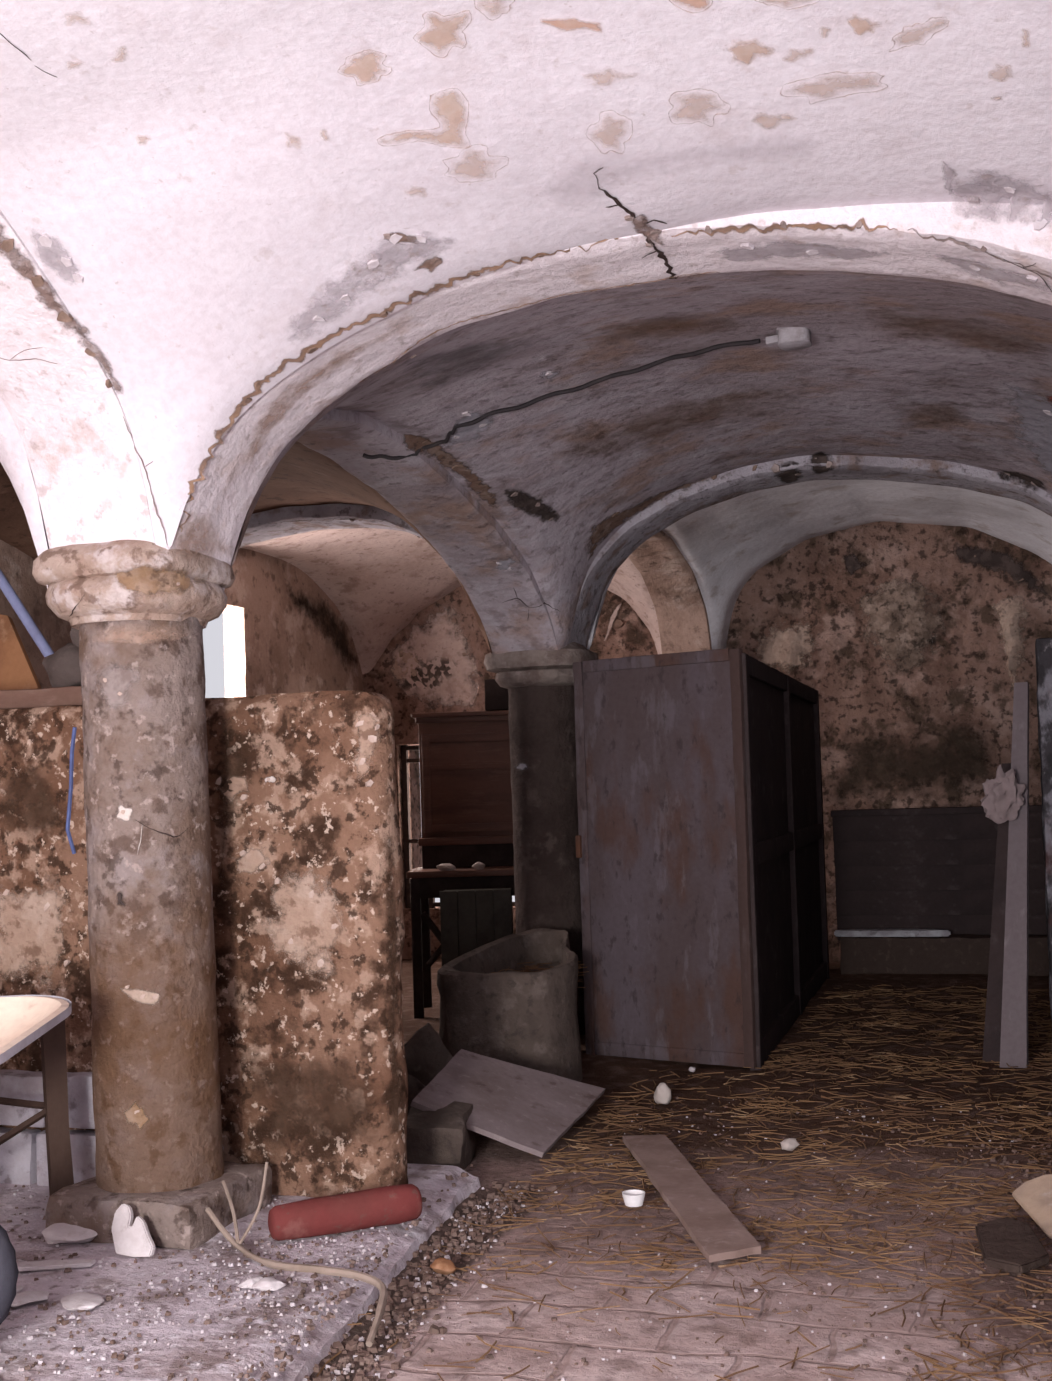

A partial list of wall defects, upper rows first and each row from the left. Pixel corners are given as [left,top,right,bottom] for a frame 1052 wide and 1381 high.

crack [593,168,677,279]
spalling [0,225,121,391]
peeling [179,232,618,532]
water stain [2,769,59,829]
water stain [220,721,243,849]
water stain [833,725,991,799]
water stain [387,839,400,1132]